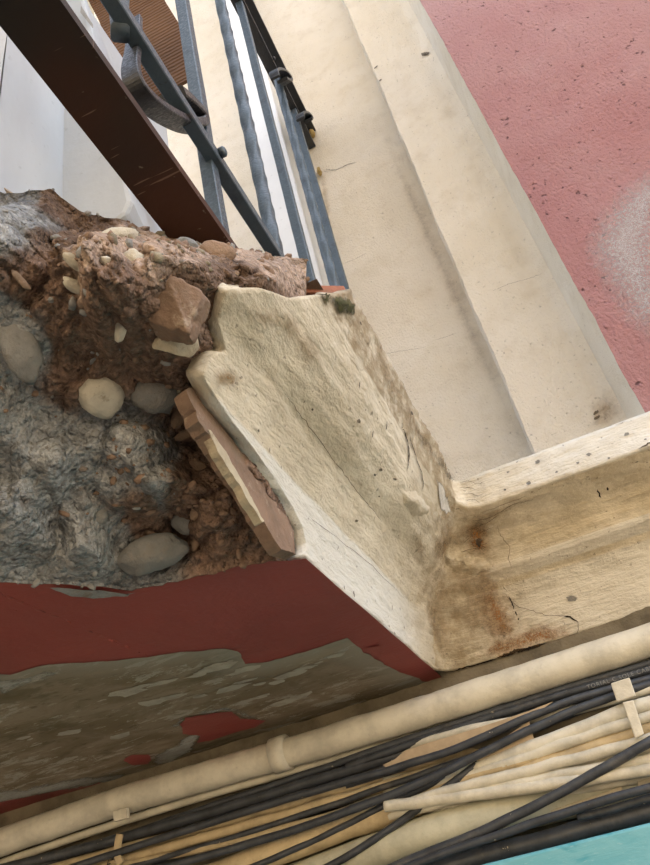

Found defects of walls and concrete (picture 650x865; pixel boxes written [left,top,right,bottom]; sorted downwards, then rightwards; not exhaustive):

spalling [0,188,310,599]
corrosion [471,527,487,550]
corrosion [484,595,564,654]
peeling [0,638,426,802]